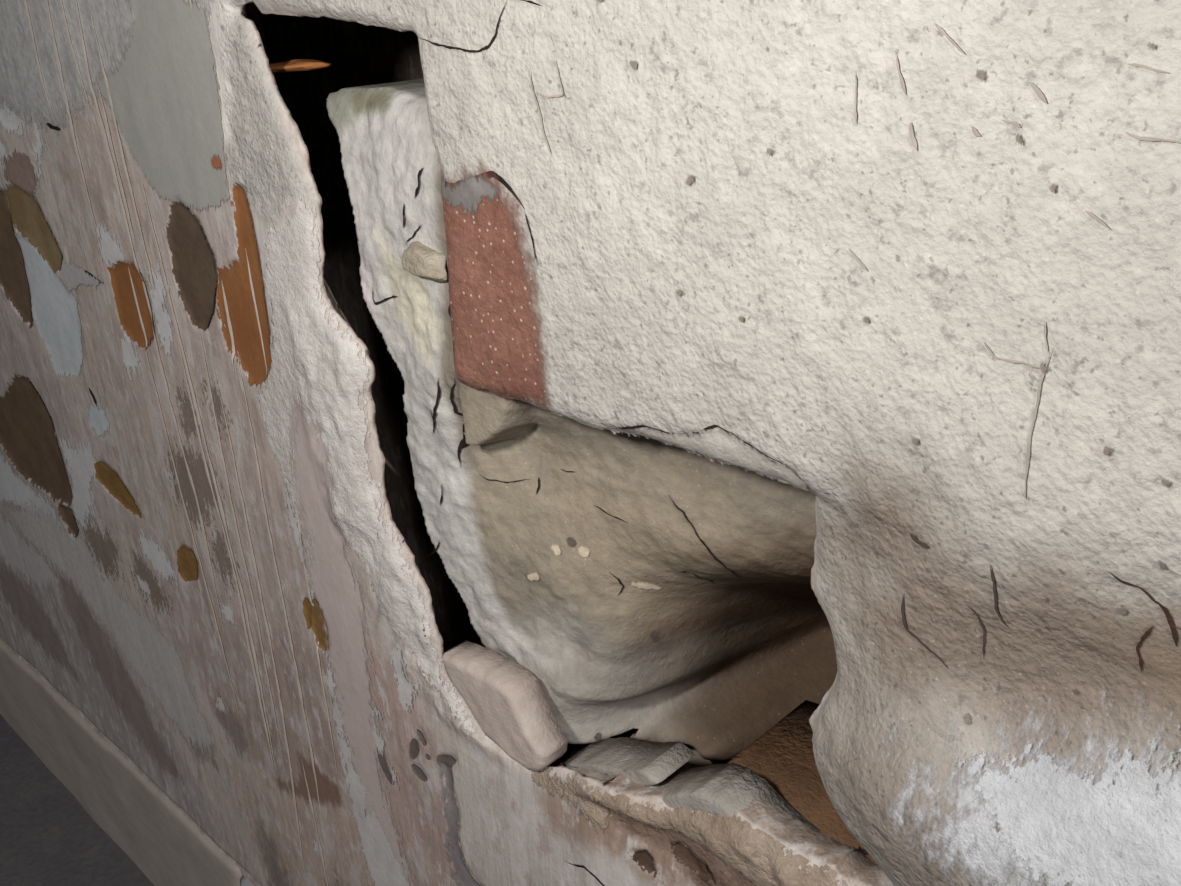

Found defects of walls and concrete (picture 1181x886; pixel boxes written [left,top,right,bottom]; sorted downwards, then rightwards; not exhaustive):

flaking render [0,0,134,328]
spalling [269,59,332,73]
crack [420,0,541,53]
crack [896,56,917,151]
flaking render [96,183,271,388]
flaking render [0,375,240,617]
spalling [326,78,856,886]
crack [609,425,799,478]
crack [984,322,1052,504]
flaking render [302,597,329,652]
crack [1109,572,1181,672]
leakage [890,709,1181,886]